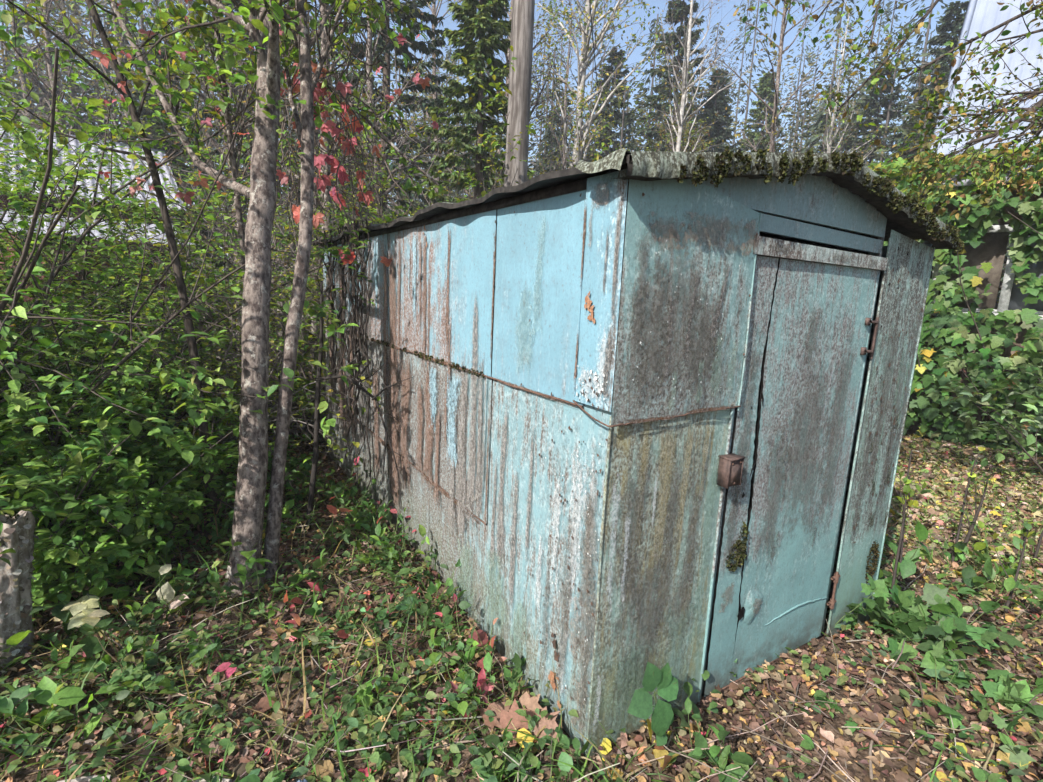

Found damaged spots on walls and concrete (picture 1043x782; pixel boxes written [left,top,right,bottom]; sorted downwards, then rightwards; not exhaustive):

corrosion [580,200,595,324]
corrosion [326,225,490,546]
corrosion [498,335,608,410]
corrosion [548,670,561,709]